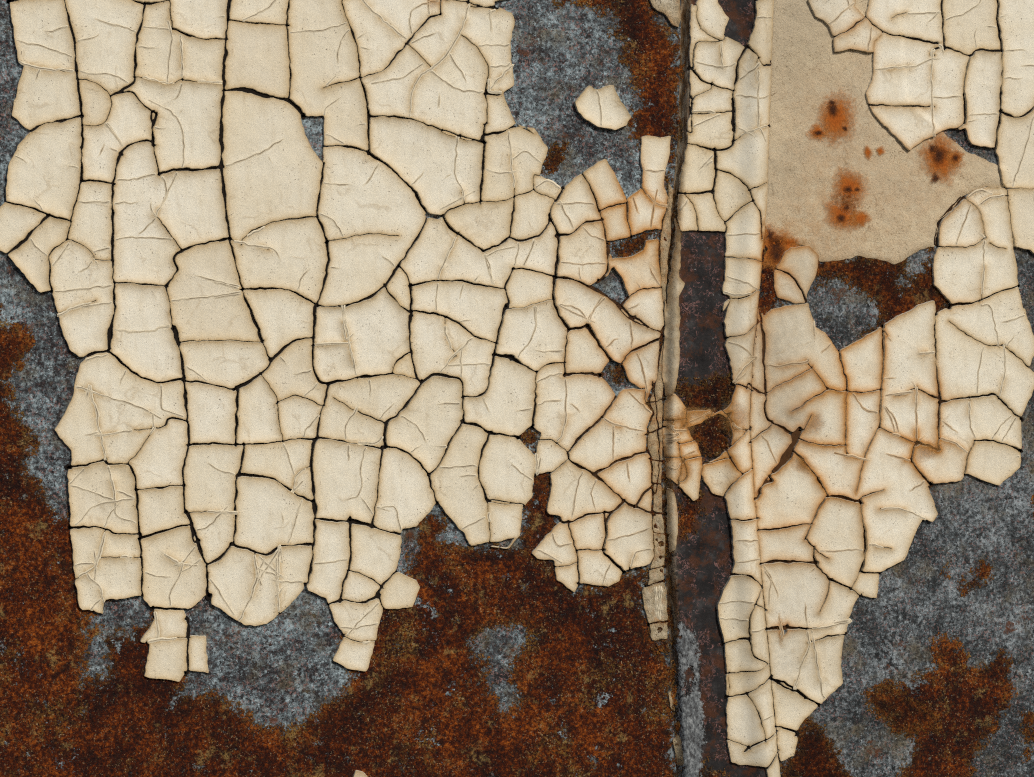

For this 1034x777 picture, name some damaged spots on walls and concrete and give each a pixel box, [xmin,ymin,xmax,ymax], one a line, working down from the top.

corrosion [540,140,569,179]
corrosion [552,0,686,368]
corrosion [810,99,852,140]
corrosion [921,136,963,182]
peeling [0,0,685,682]
crack [6,0,1034,608]
peeling [647,0,1034,777]
crack [150,606,190,676]
corrosion [0,303,735,777]
crack [721,519,862,752]
corrosion [780,716,856,777]
corrosion [860,632,1034,777]